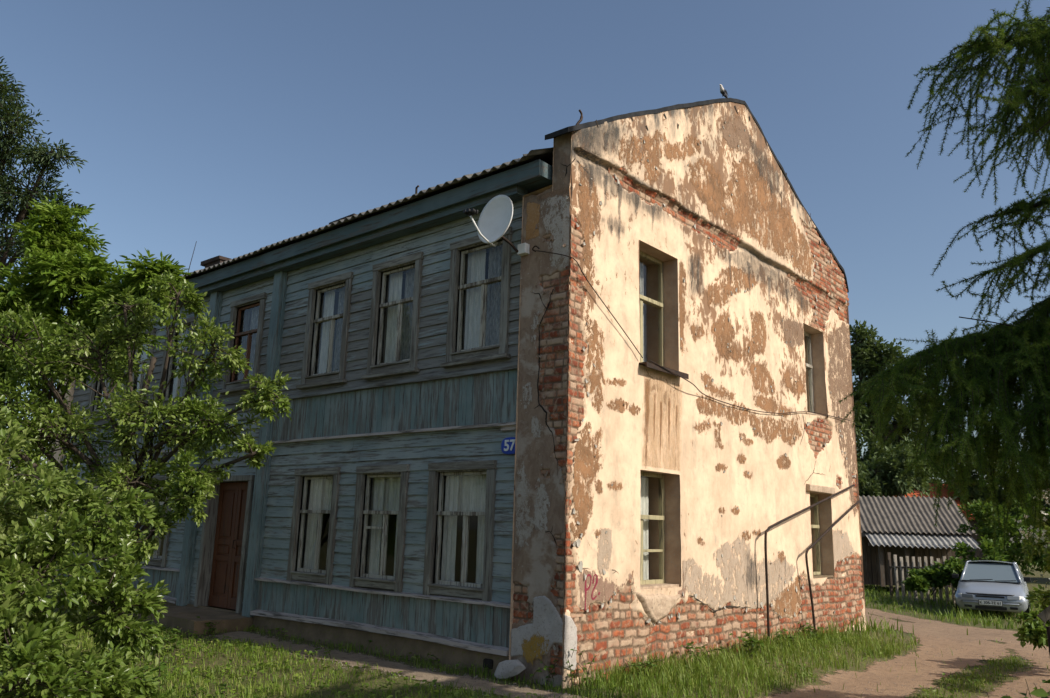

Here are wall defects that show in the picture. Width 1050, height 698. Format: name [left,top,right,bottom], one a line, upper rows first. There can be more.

flaking render [513,115,864,686]